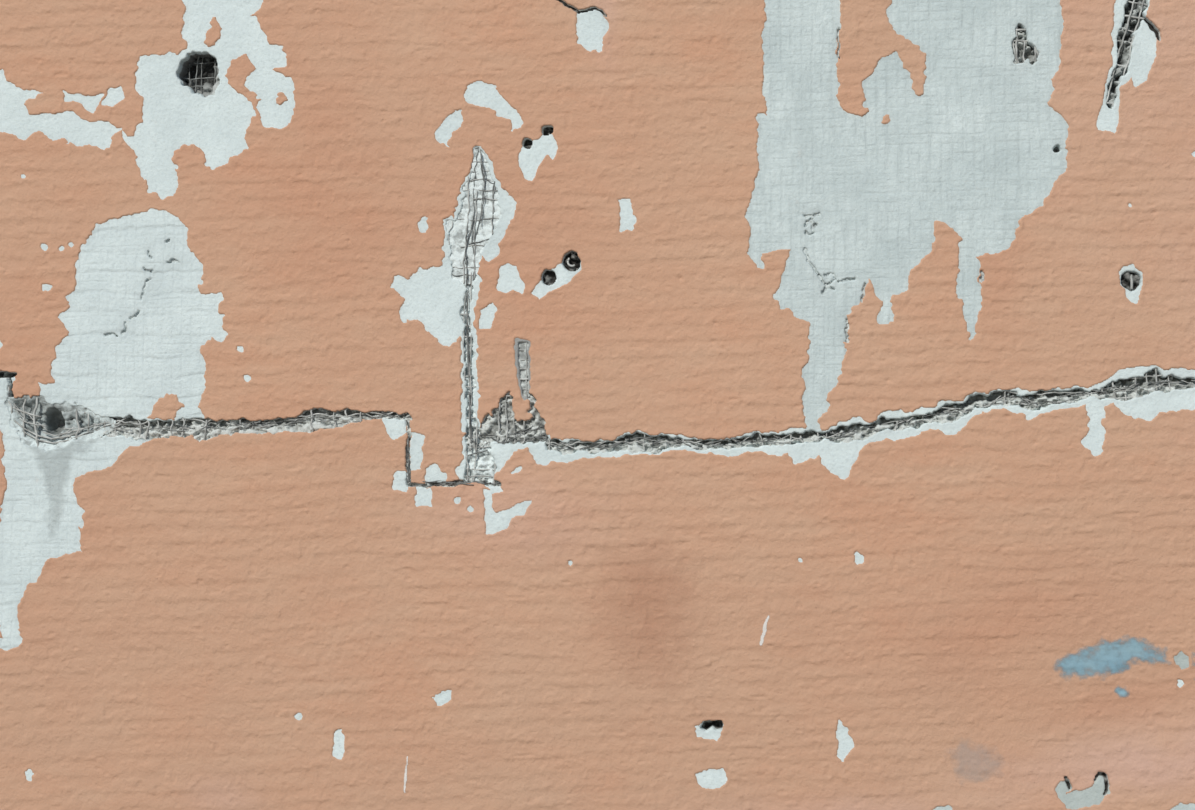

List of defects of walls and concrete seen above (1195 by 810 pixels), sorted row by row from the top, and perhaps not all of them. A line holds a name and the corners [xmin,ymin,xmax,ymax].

crack [557,0,607,17]
peeling [0,0,295,422]
peeling [435,81,523,147]
peeling [518,134,558,181]
peeling [745,0,1069,443]
peeling [382,146,582,535]
crack [0,365,1195,488]
peeling [0,380,152,651]
peeling [696,768,727,789]
peeling [1055,772,1110,810]